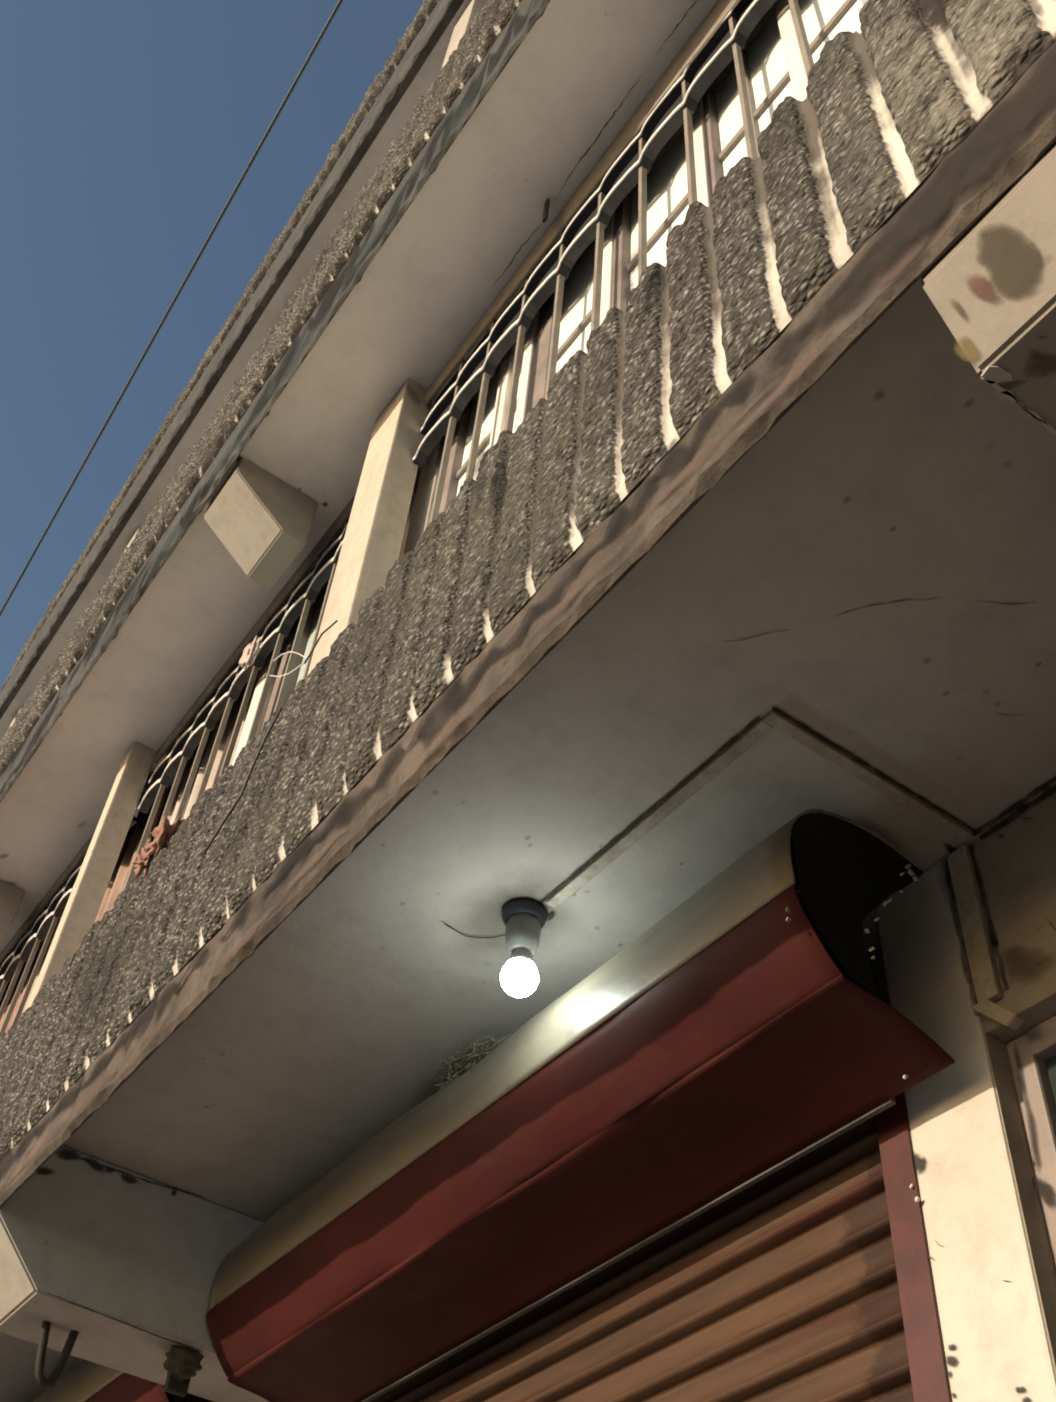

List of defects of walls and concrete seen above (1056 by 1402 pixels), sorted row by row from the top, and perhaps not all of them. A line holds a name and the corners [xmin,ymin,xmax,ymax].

water stain [777,42,1056,360]
water stain [223,381,748,940]
water stain [0,947,205,1176]